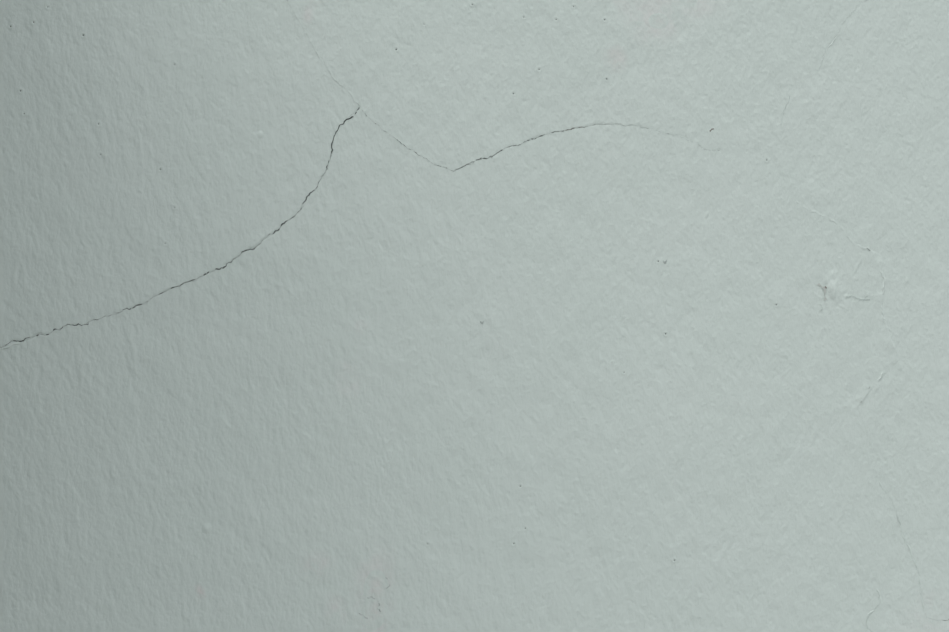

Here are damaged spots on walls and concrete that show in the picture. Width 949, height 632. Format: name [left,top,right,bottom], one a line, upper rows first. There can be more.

crack [0,0,687,350]